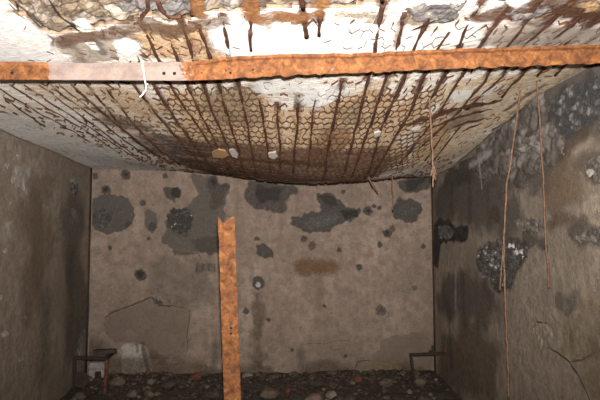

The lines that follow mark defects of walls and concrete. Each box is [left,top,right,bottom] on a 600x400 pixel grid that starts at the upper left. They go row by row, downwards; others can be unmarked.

flaking render [0,0,488,63]
spalling [505,0,552,20]
flaking render [254,80,351,109]
flaking render [0,113,183,171]
spalling [469,73,600,189]
spalling [166,208,194,237]
spalling [476,218,545,292]
crack [548,347,595,400]